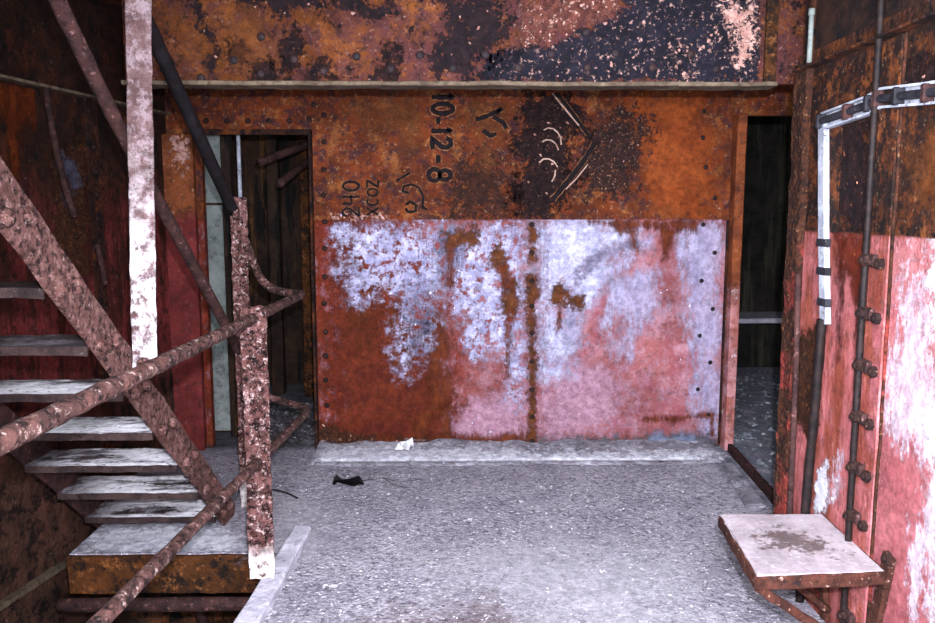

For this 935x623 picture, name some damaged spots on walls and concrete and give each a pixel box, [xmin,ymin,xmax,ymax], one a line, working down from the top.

rust [225,20,339,81]
rust [374,38,404,81]
rust [588,91,718,262]
rust [319,221,587,444]
peeling [330,214,642,403]
rust [797,325,820,440]
rust [833,232,863,347]
rust [869,310,883,403]
peeling [884,244,935,507]